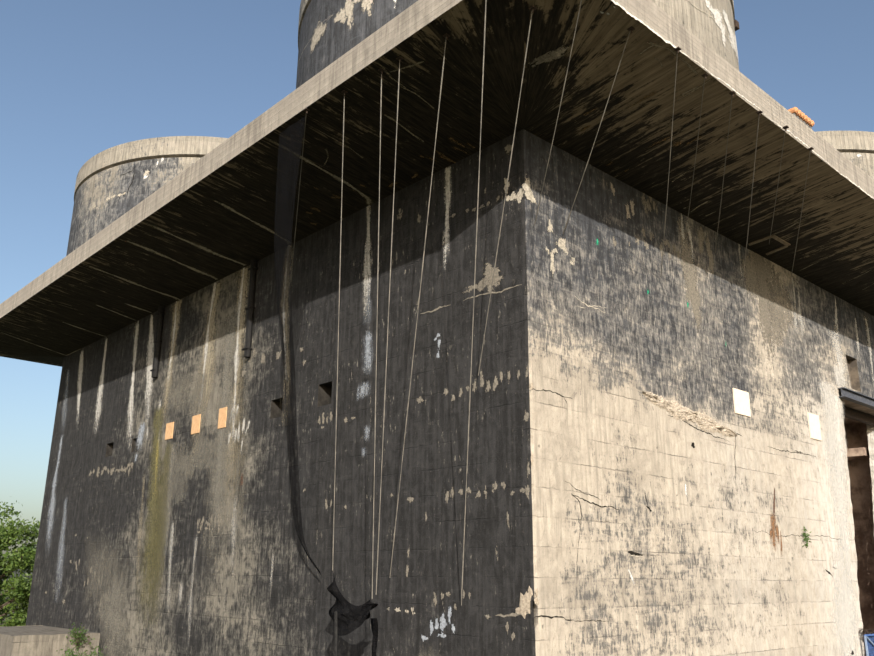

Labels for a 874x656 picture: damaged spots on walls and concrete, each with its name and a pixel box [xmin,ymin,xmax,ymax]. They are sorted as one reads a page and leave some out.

peeling [311,0,373,52]
peeling [449,174,536,218]
peeling [463,263,522,300]
damp [63,322,108,431]
damp [127,226,250,550]
damp [47,436,62,538]
damp [89,266,182,619]
crack [565,481,618,573]
rust [770,488,782,551]
damp [820,352,857,656]
spalling [485,586,539,641]
crack [534,614,609,622]